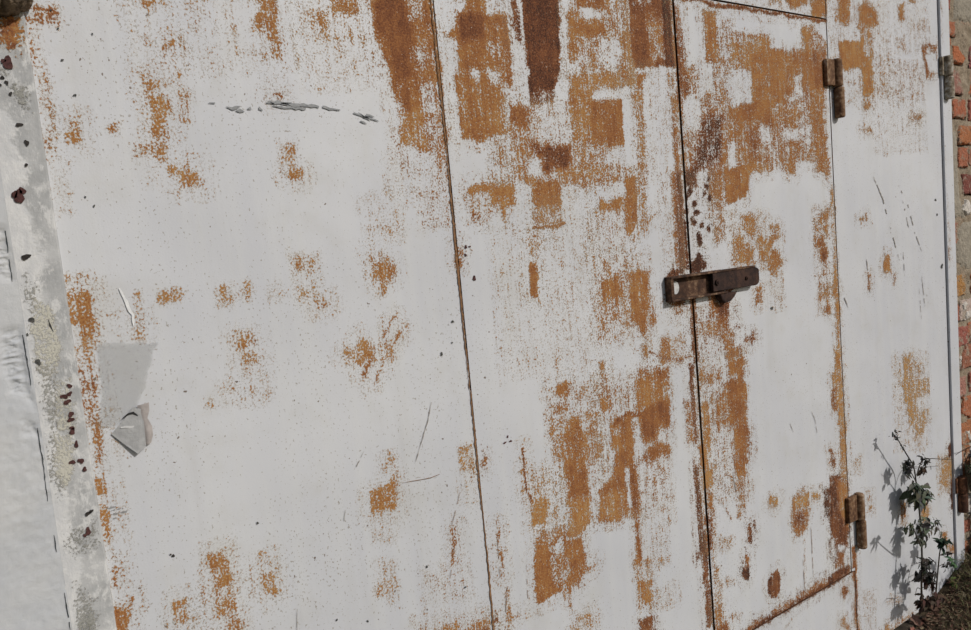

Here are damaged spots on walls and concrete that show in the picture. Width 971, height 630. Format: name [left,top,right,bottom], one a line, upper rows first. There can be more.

corrosion [114,0,217,205]
corrosion [64,272,184,630]
corrosion [161,536,288,630]
corrosion [203,0,943,630]